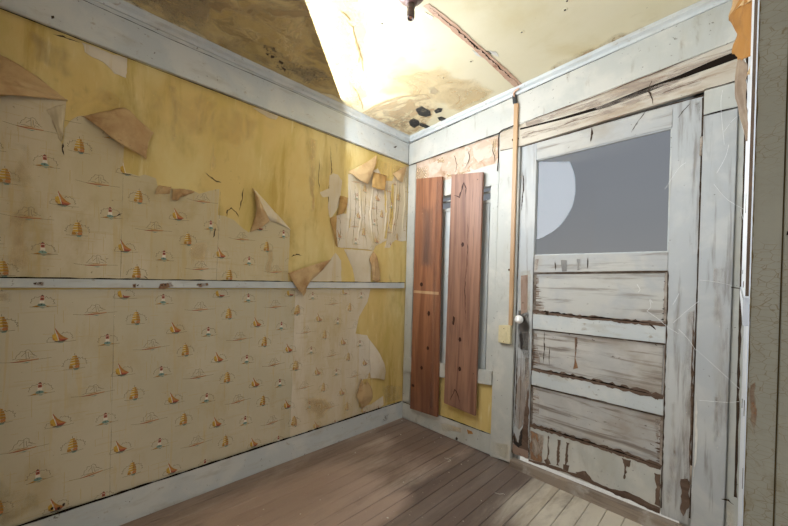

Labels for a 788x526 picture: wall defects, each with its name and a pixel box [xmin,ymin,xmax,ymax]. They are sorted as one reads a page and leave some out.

crack [0,0,737,202]
damp [363,90,446,132]
spalling [349,135,500,191]
peeling [155,185,194,201]
peeling [250,188,291,232]
peeling [330,196,348,247]
peeling [369,251,381,282]
peeling [742,2,761,526]
peeling [356,340,386,409]